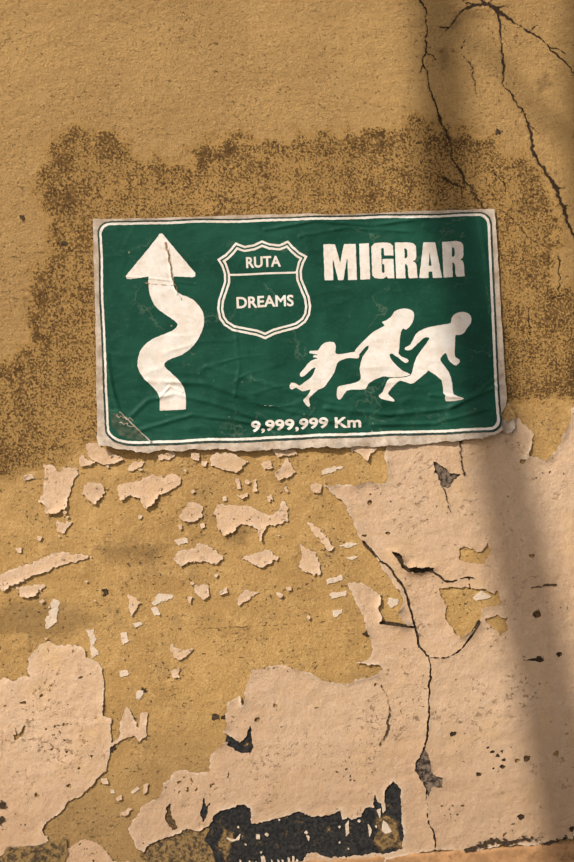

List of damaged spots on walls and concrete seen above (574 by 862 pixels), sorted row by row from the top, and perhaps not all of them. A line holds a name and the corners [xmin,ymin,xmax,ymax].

crack [419,0,574,243]
leakage [0,110,574,483]
peeling [510,396,574,464]
spalling [433,461,460,488]
peeling [392,551,435,573]
peeling [459,543,491,564]
peeling [439,587,508,637]
peeling [0,435,407,862]
crack [362,541,481,749]
spalling [413,749,443,796]
crack [426,790,436,851]
spalling [464,826,574,853]